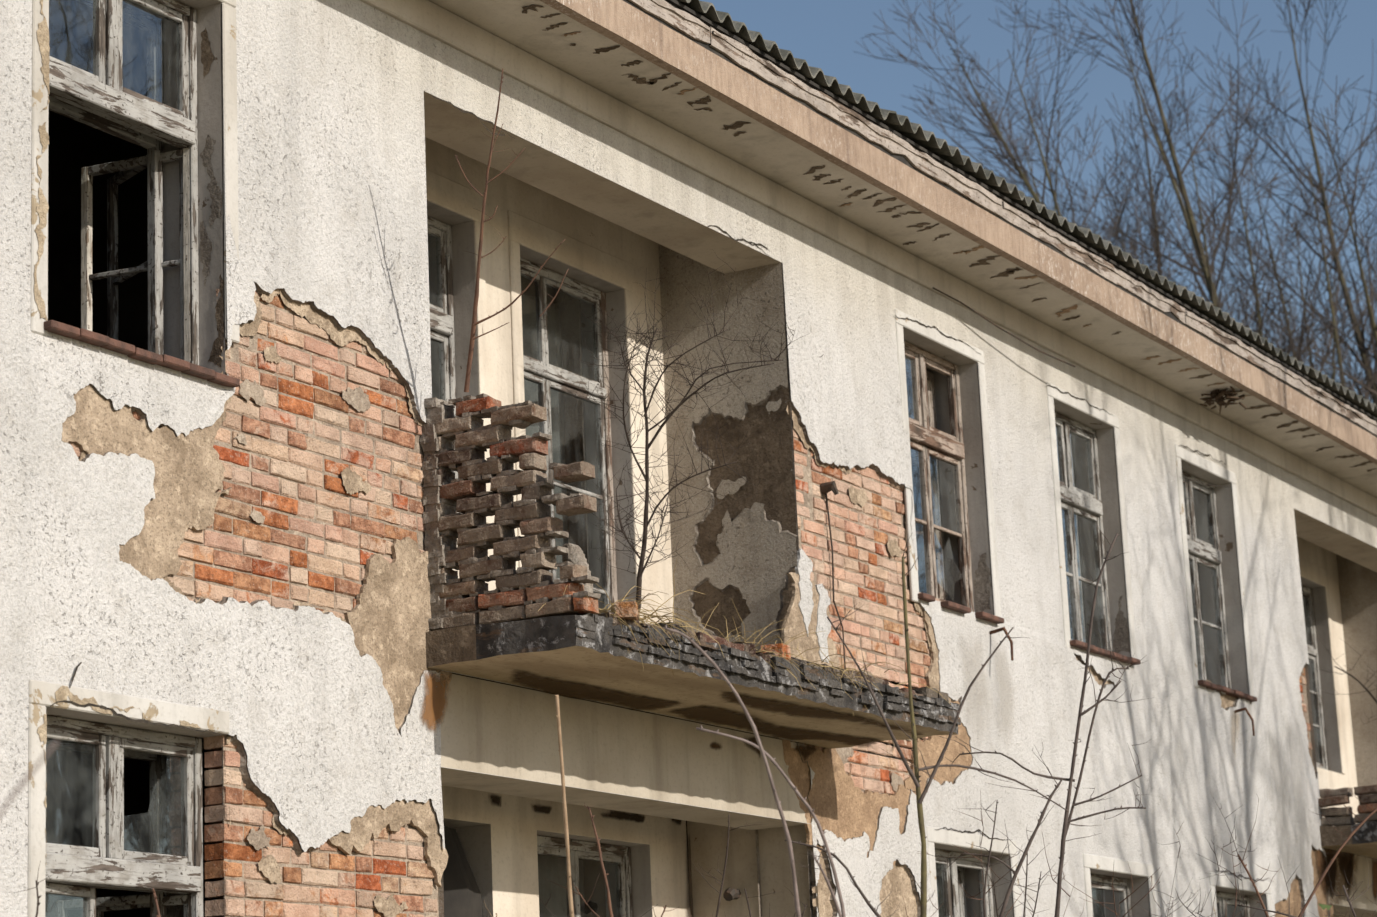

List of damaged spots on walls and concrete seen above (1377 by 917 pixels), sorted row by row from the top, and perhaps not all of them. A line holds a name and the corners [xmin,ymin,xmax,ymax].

peeling [201,27,215,79]
flaking render [61,135,452,737]
flaking render [688,384,973,917]
peeling [37,685,150,865]
flaking render [180,720,448,917]
flaking render [1275,846,1335,917]